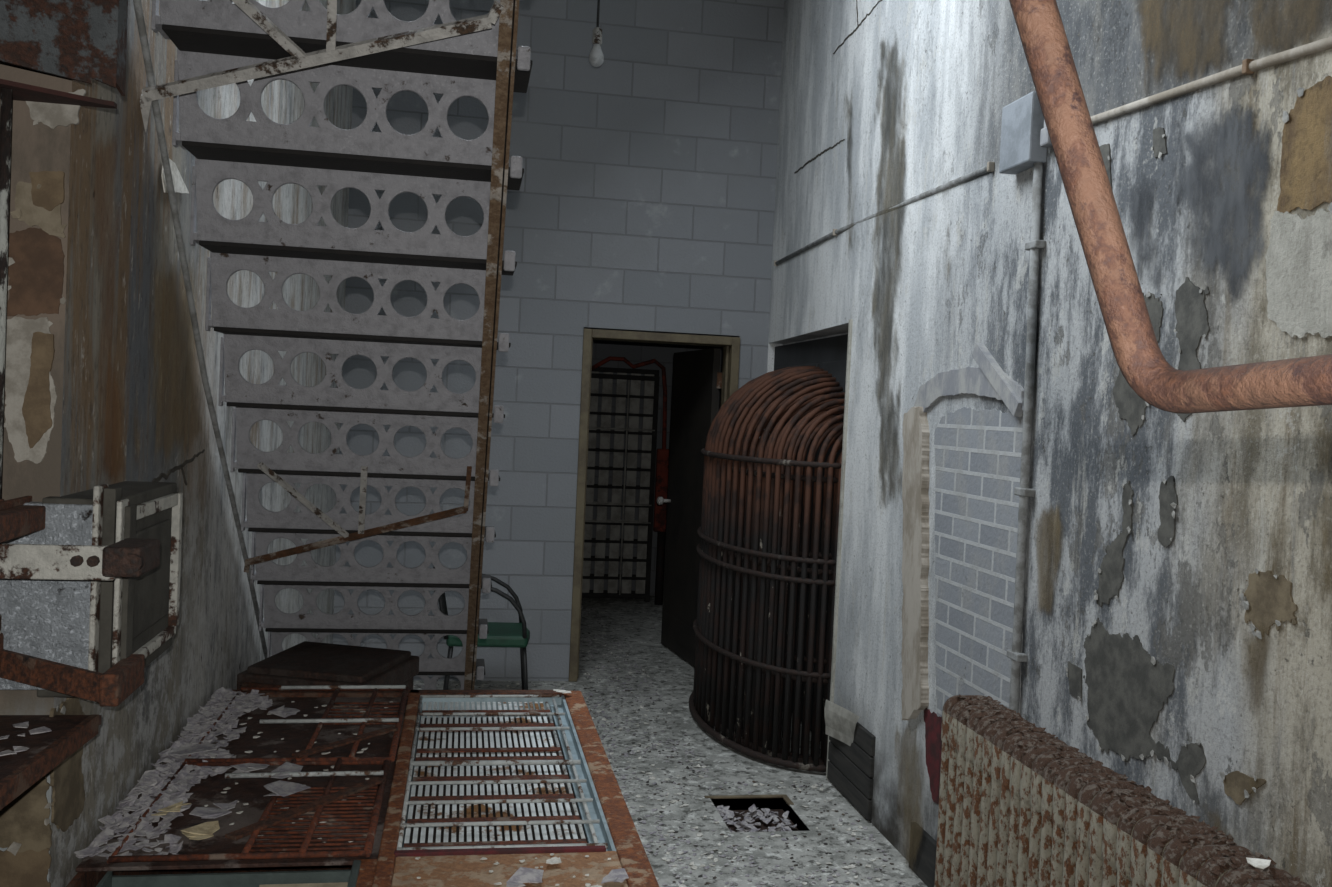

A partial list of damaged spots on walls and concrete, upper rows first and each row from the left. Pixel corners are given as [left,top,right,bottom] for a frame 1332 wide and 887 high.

peeling [3,171,67,464]
peeling [26,89,86,129]
water stain [872,42,905,496]
water stain [1130,184,1160,281]
water stain [1172,106,1269,300]
peeling [1265,76,1332,338]
peeling [1065,476,1206,804]
spalling [1239,568,1298,639]
spalling [1219,771,1266,805]